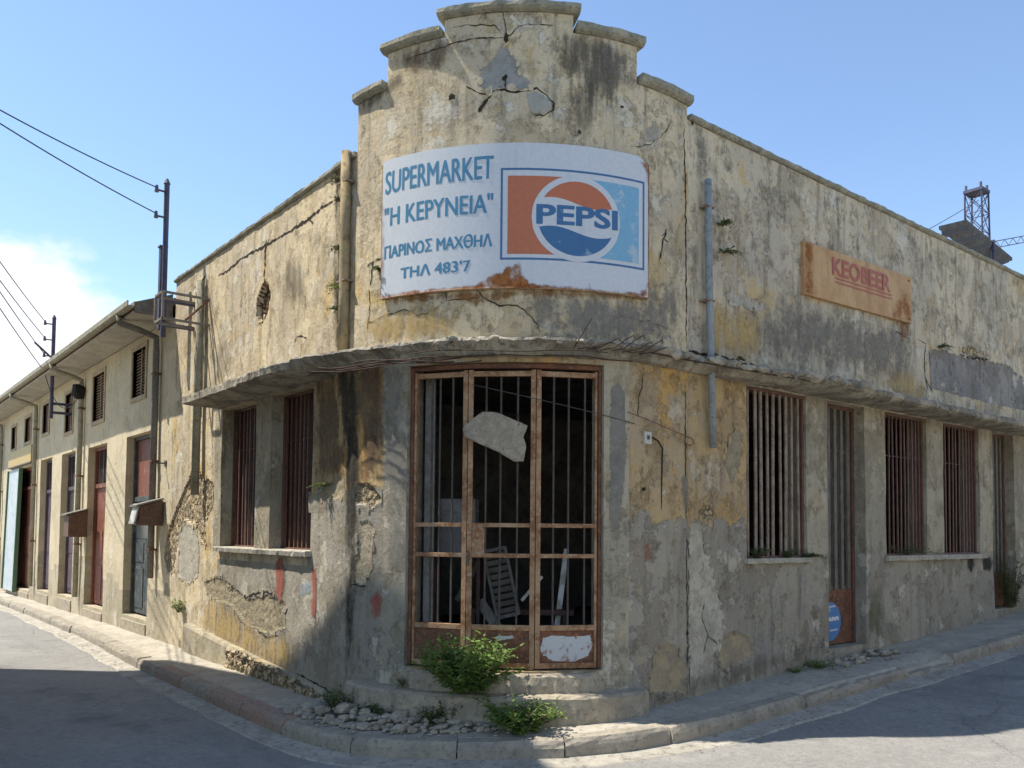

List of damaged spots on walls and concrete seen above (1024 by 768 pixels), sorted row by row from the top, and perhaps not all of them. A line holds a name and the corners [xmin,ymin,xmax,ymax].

crack [406,12,553,60]
peeling [476,43,534,97]
crack [466,80,555,116]
water stain [564,34,626,128]
crack [194,202,332,288]
spalling [255,277,270,324]
crack [367,258,540,332]
water stain [714,303,923,399]
peeling [929,346,1024,410]
spalling [164,470,287,639]
water stain [315,366,408,657]
peeling [649,506,754,698]